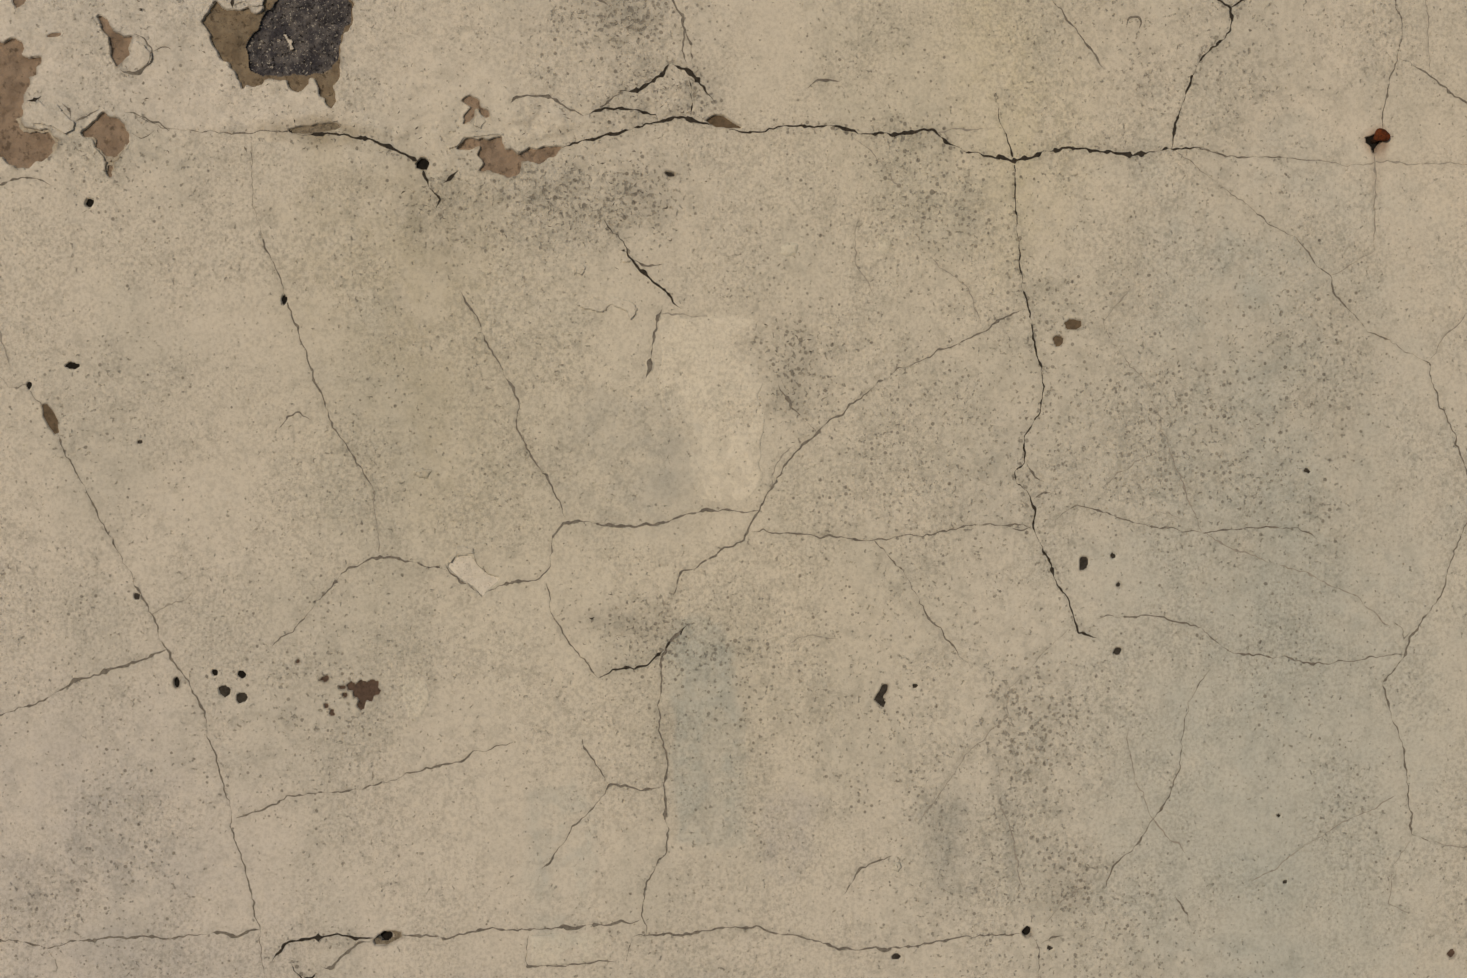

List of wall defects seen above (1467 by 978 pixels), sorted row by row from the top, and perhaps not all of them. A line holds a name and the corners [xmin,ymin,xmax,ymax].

peeling [0,39,172,186]
peeling [98,0,152,78]
crack [121,34,170,75]
peeling [202,0,354,133]
crack [125,112,441,208]
peeling [444,96,561,178]
rust [1356,122,1394,205]
crack [1381,0,1467,128]
crack [1224,155,1467,474]
crack [251,0,1256,968]
crack [1055,289,1467,914]
crack [0,435,513,978]